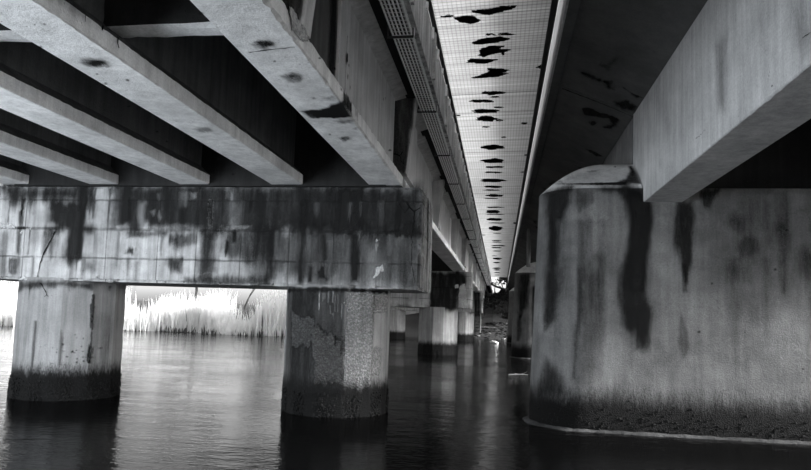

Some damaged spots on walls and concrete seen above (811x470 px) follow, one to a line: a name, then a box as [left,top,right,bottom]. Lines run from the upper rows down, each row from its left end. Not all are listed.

leakage [301,89,352,123]
leakage [393,98,414,174]
leakage [562,87,639,129]
crack [37,231,55,297]
leakage [2,184,96,273]
leakage [19,281,93,290]
leakage [108,184,466,396]
leakage [517,273,535,340]
leakage [544,166,653,346]
leakage [674,202,694,283]
leakage [701,189,719,207]
leakage [538,364,562,394]